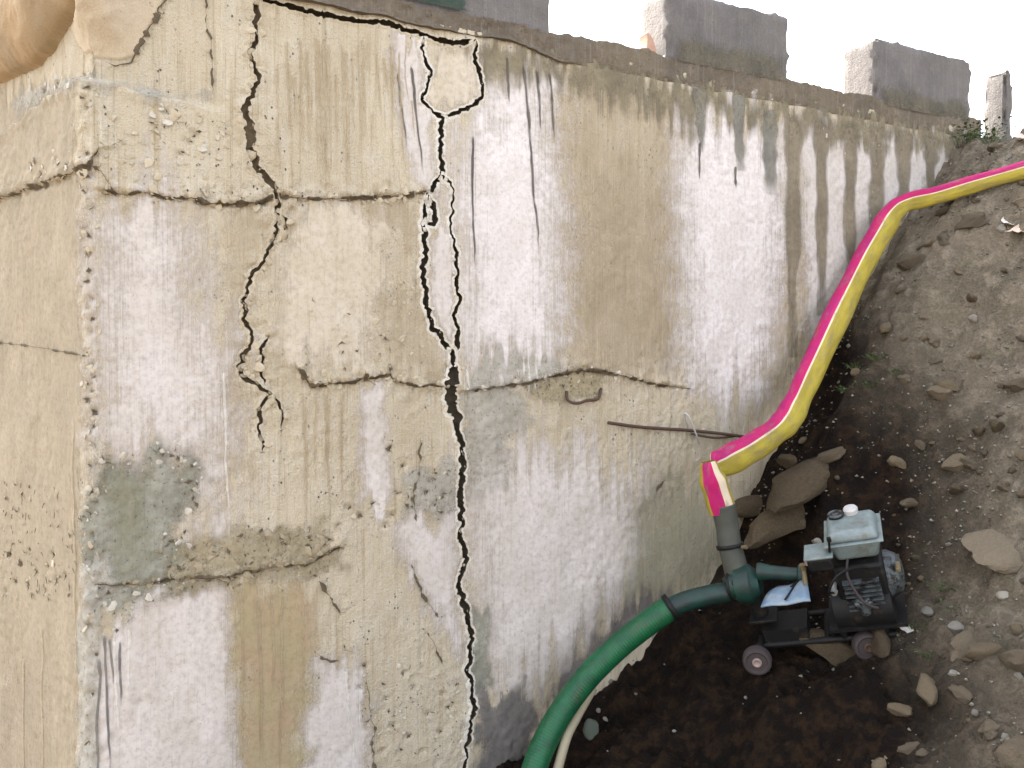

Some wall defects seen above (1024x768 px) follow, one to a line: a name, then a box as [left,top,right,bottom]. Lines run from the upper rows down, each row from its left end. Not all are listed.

crack [0,0,690,768]
damp [479,38,973,350]